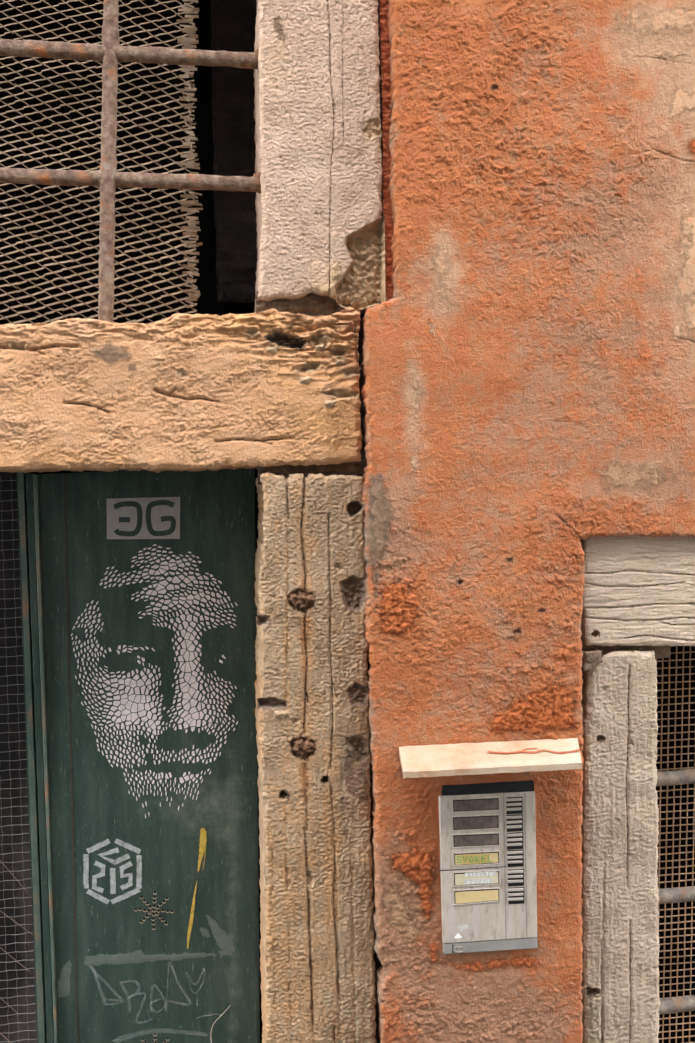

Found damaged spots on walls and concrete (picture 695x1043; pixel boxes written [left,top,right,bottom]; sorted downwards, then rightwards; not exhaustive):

peeling [616,7,695,40]
peeling [667,88,695,119]
spalling [330,0,394,309]
spalling [8,340,27,351]
spalling [243,327,361,407]